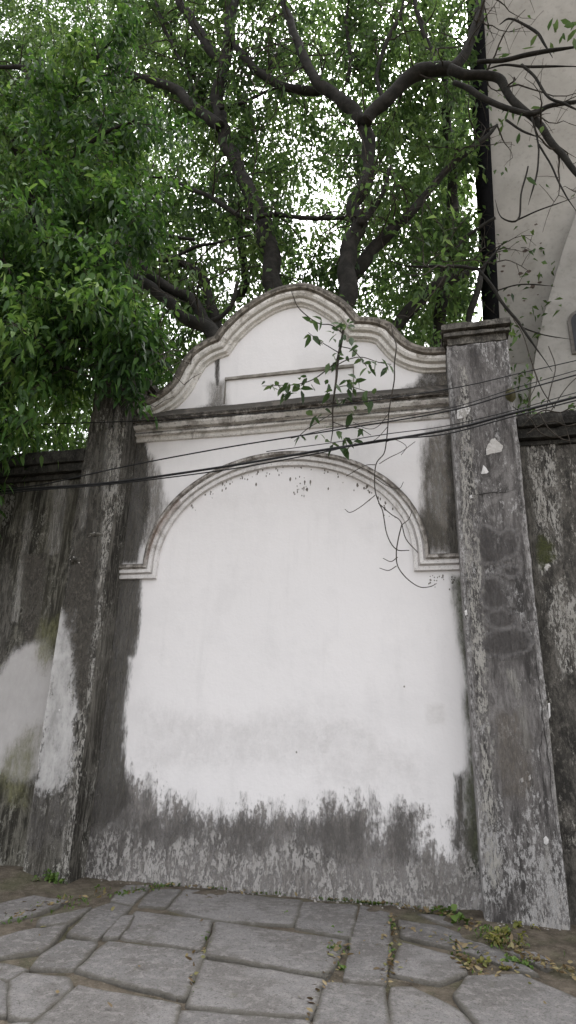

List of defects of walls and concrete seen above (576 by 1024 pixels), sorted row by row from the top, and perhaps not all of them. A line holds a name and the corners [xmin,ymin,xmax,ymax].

damp [0,413,120,761]
damp [123,442,163,564]
damp [409,372,448,405]
damp [420,431,458,553]
peeling [457,366,503,888]
damp [474,446,541,659]
damp [85,574,482,911]